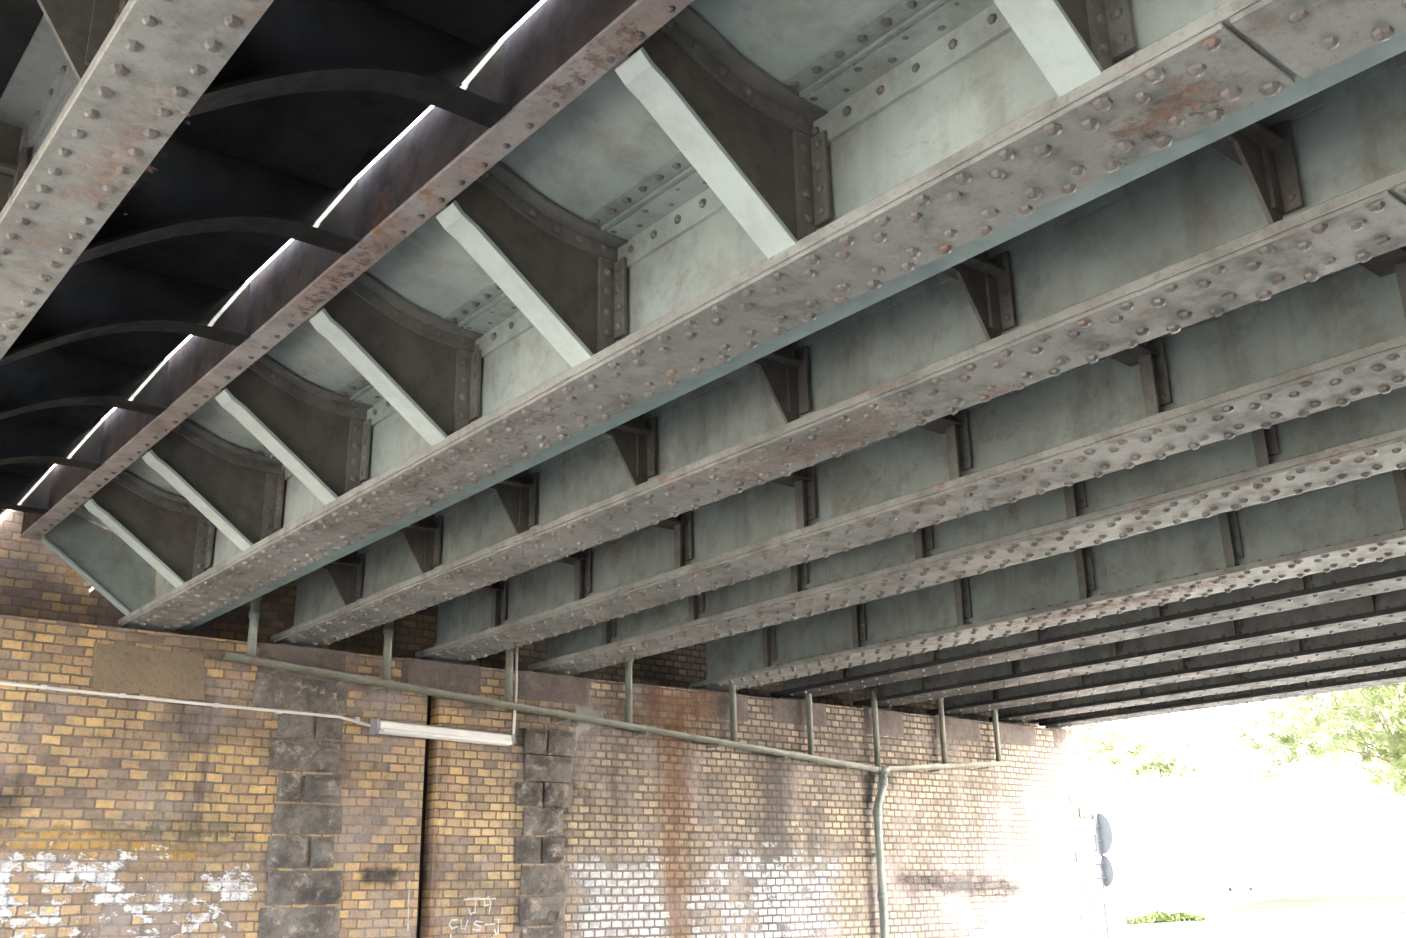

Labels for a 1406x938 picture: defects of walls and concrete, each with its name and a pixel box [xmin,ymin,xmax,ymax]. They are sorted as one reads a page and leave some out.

rust [1111,76,1222,139]
leakage [758,754,789,938]